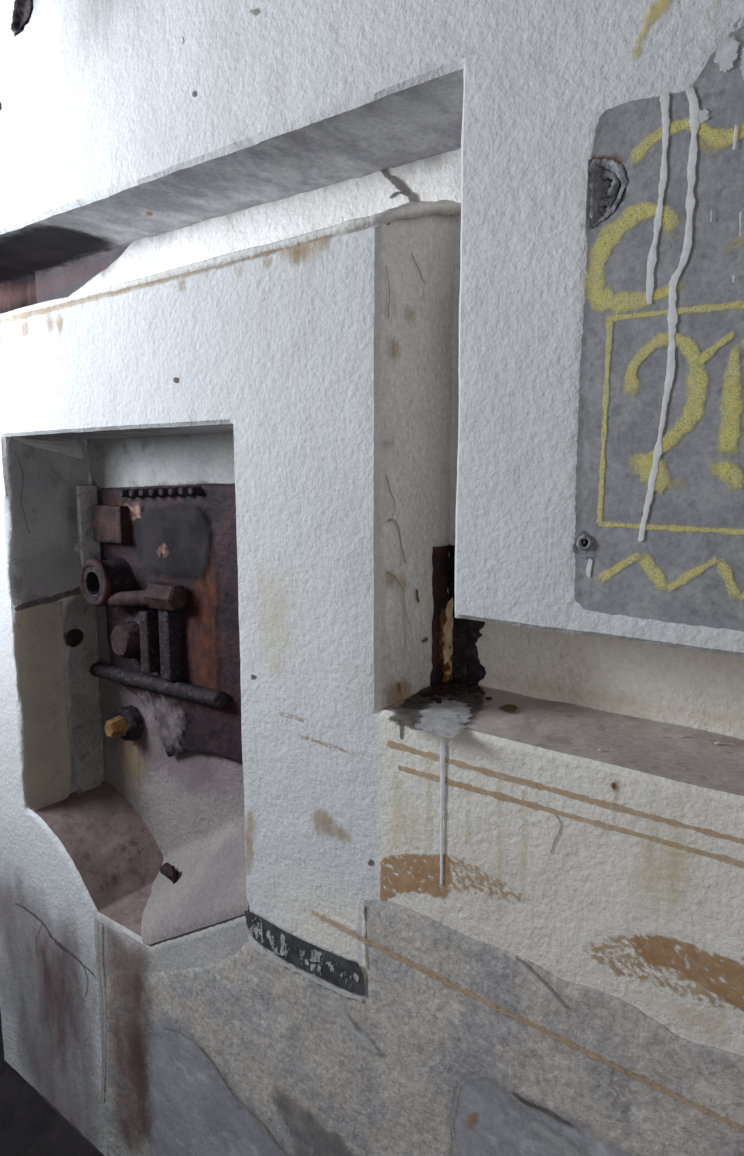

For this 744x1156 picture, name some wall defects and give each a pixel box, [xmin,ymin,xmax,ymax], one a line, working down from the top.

peeling [574,17,744,631]
corrosion [190,575,216,689]
flaking render [101,900,744,1156]